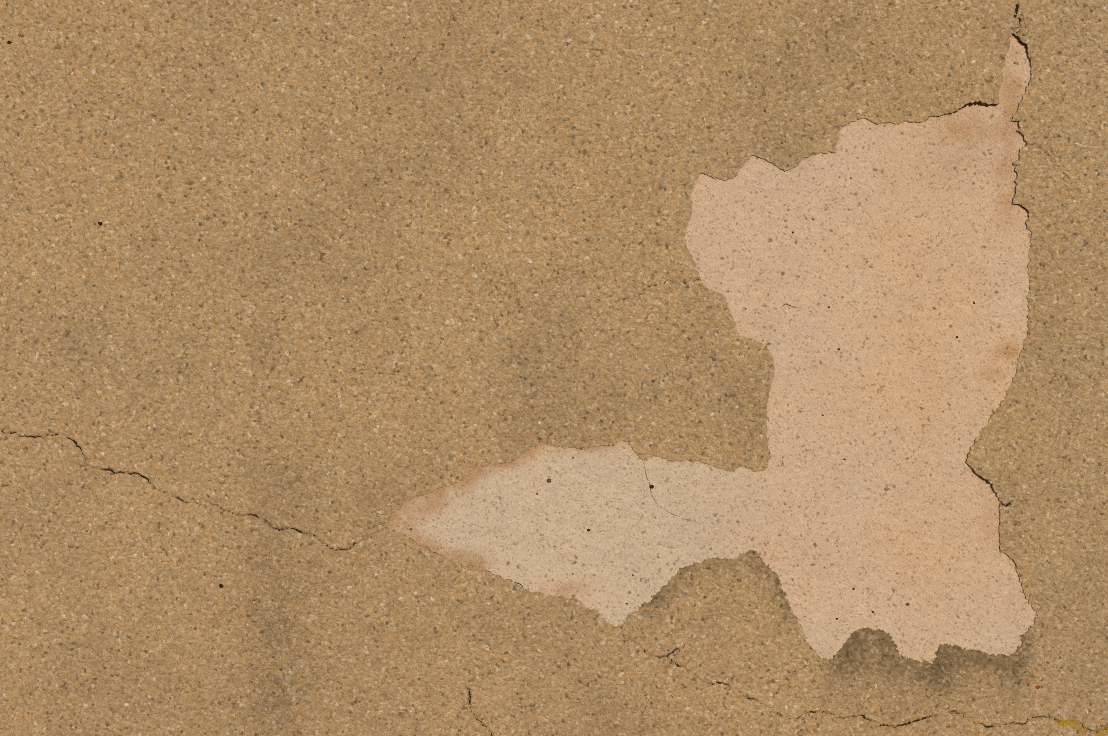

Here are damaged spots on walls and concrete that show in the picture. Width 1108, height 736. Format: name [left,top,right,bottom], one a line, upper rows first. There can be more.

crack [1014,4,1022,33]
peeling [383,8,1050,664]
crack [0,430,385,551]
crack [468,681,492,736]
crack [615,631,1108,733]